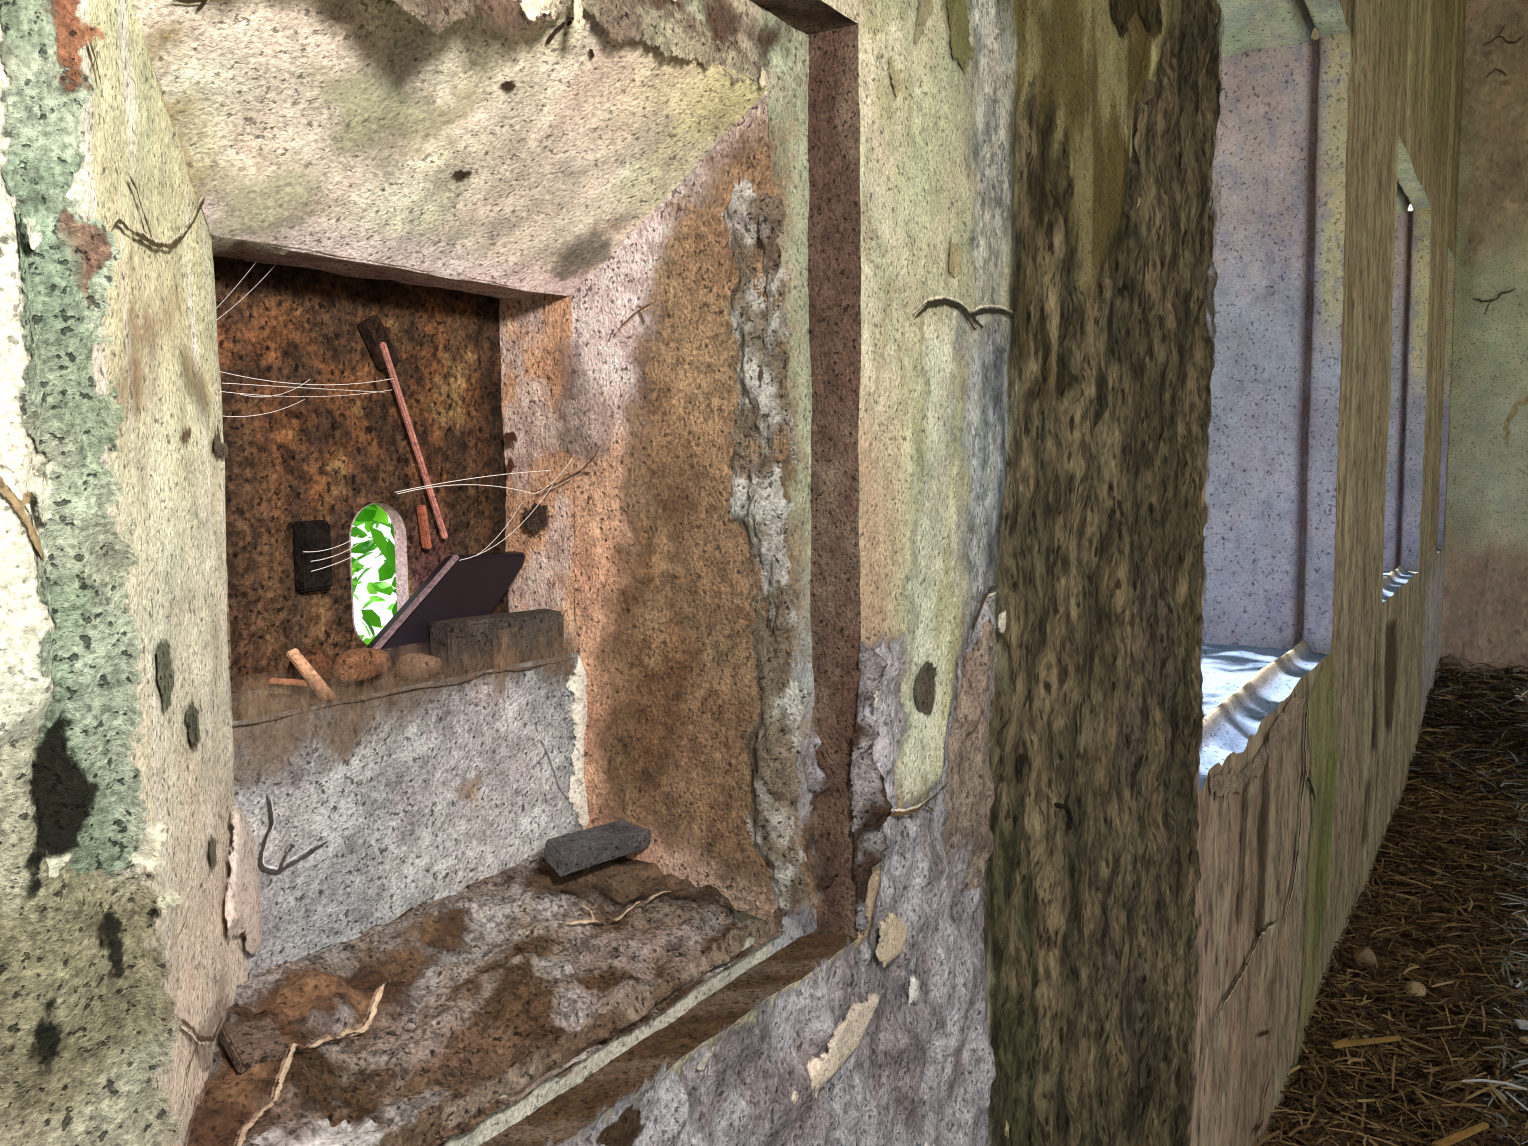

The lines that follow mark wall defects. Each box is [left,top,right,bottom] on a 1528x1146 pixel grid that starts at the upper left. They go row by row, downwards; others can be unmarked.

crack [170,0,210,11]
spalling [386,0,487,34]
spalling [500,80,517,91]
spalling [452,170,472,180]
crack [113,173,205,249]
crack [913,295,1015,330]
spalling [214,418,228,458]
spalling [0,0,200,1146]
spalling [519,0,1224,1146]
spalling [373,177,810,1146]
peeling [209,835,217,874]
spalling [219,1018,289,1074]